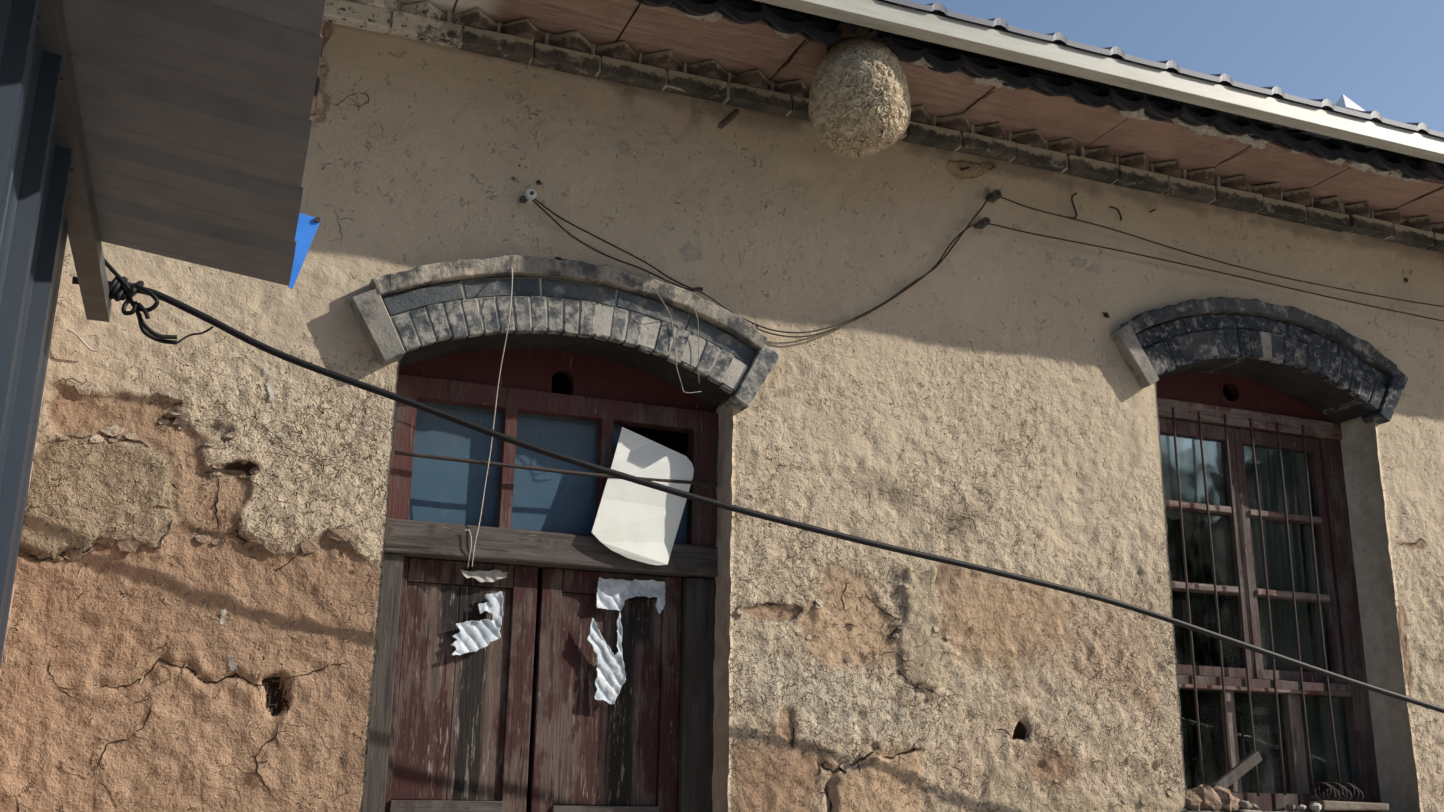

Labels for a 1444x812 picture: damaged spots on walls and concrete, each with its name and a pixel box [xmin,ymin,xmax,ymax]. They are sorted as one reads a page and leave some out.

crack [0,642,349,812]
peeling [0,384,380,812]
crack [809,577,962,812]
peeling [736,565,1070,698]
spalling [997,721,1026,740]
peeling [984,744,1186,812]
crack [1106,740,1182,812]